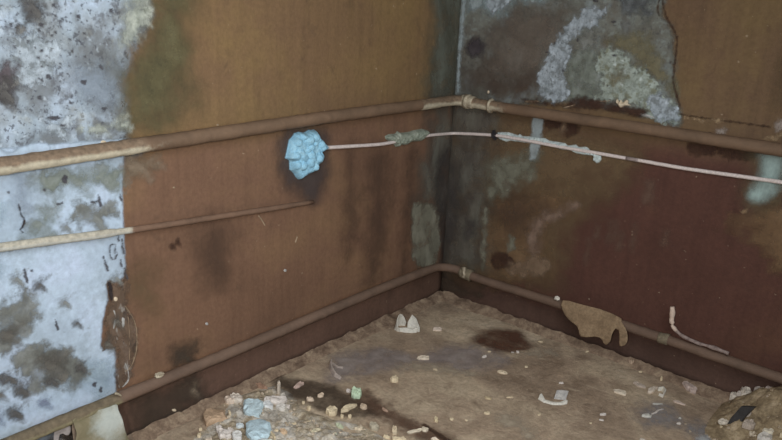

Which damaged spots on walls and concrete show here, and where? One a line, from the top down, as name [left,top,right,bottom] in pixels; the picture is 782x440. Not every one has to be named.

flaking render [0,0,153,157]
peeling [455,0,681,127]
crack [657,0,770,134]
leakage [421,106,639,297]
leakage [0,269,102,407]
flaking render [0,154,138,440]
peeling [554,296,628,346]
leakage [0,406,24,421]